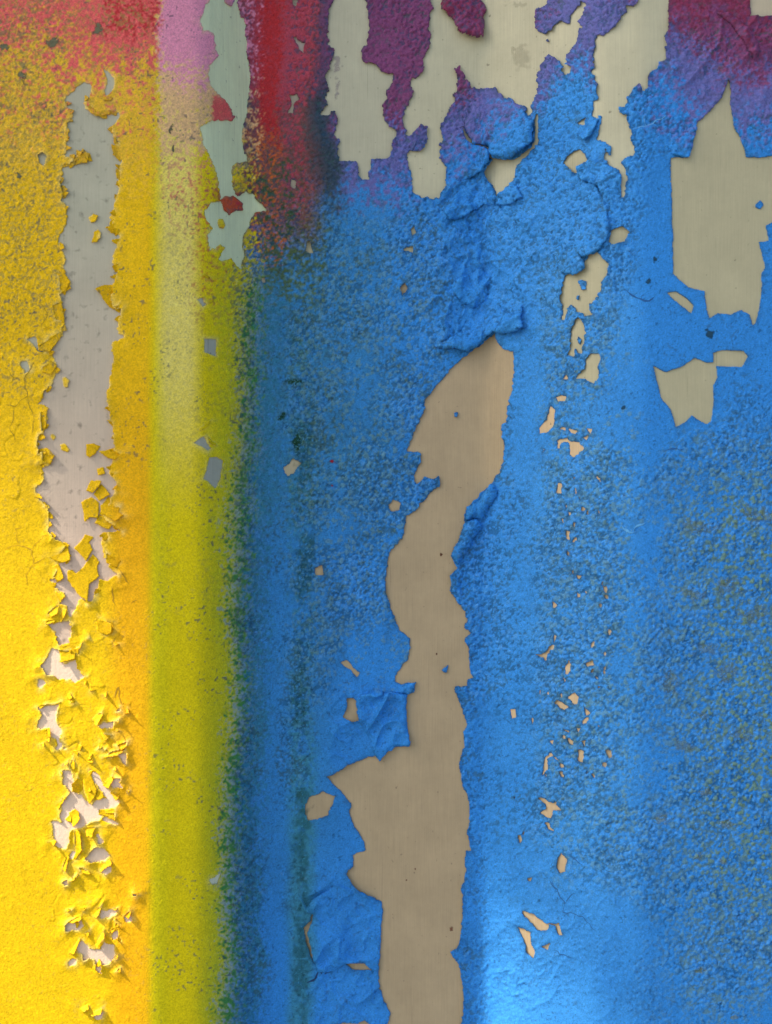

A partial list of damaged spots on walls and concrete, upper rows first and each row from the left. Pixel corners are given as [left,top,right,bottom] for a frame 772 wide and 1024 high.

peeling [200,0,267,270]
peeling [320,0,587,199]
peeling [578,0,669,198]
peeling [668,80,772,325]
peeling [20,69,130,886]
peeling [539,395,592,457]
peeling [560,252,609,383]
peeling [653,350,748,427]
peeling [305,334,514,1024]
peeling [539,690,612,778]
peeling [65,907,132,974]
peeling [518,911,562,958]